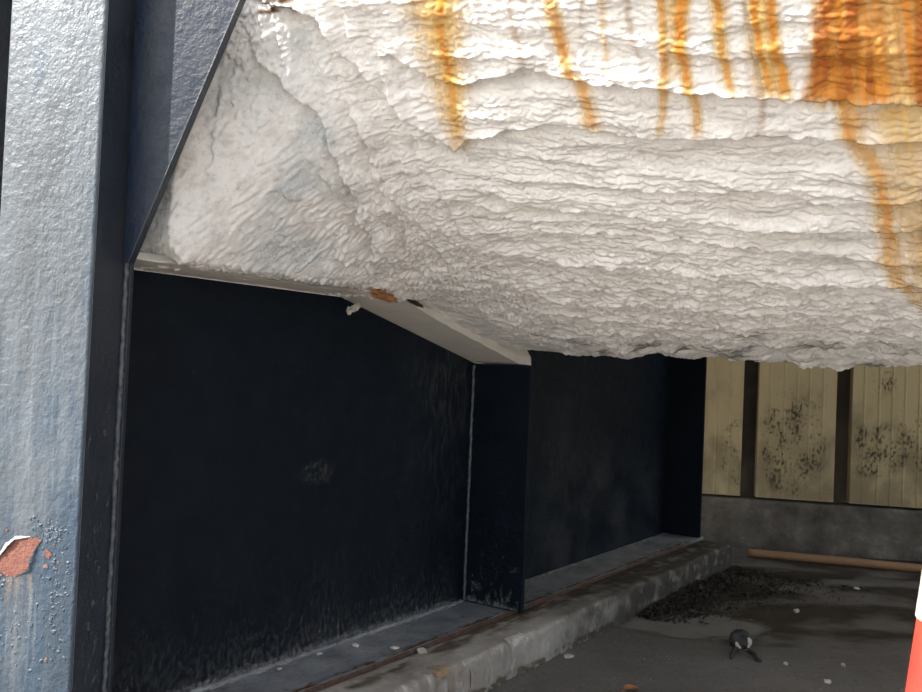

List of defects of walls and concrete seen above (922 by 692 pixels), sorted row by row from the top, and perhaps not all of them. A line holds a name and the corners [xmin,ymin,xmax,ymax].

rust [414,0,464,132]
rust [545,0,595,129]
rust [658,0,700,132]
rust [712,0,733,95]
rust [749,0,790,97]
rust [805,0,922,293]
mould [762,402,825,489]
mould [857,426,922,474]
peeling [0,529,60,577]